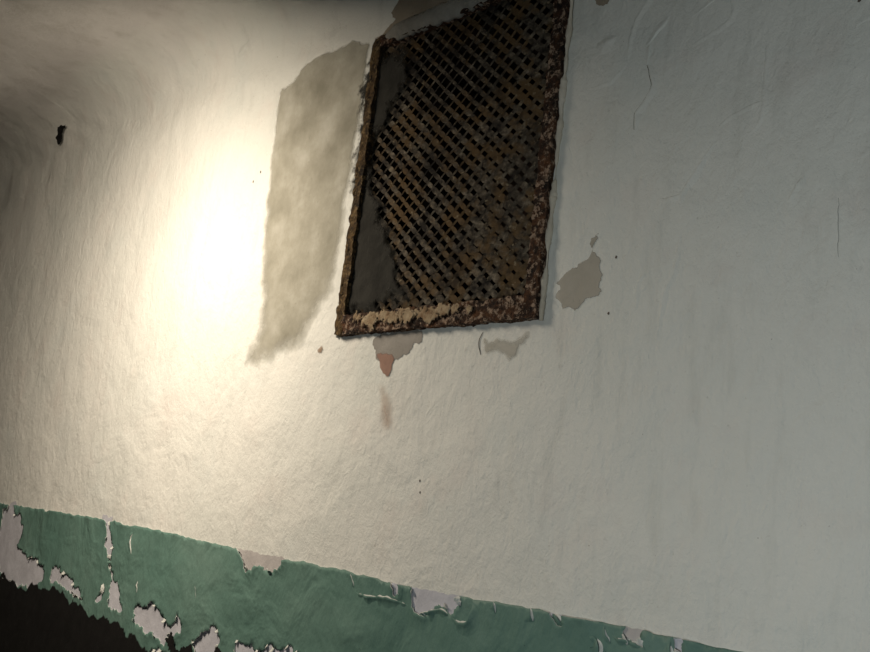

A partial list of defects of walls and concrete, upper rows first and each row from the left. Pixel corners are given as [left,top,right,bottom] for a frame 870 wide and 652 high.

flaking render [251,0,448,360]
flaking render [556,236,602,310]
flaking render [352,303,472,376]
flaking render [478,332,525,358]
peeling [96,514,122,612]
peeling [237,548,284,575]
peeling [410,587,461,615]
peeling [132,601,181,652]
peeling [191,626,220,652]
peeling [234,640,297,652]
peeling [622,626,643,646]